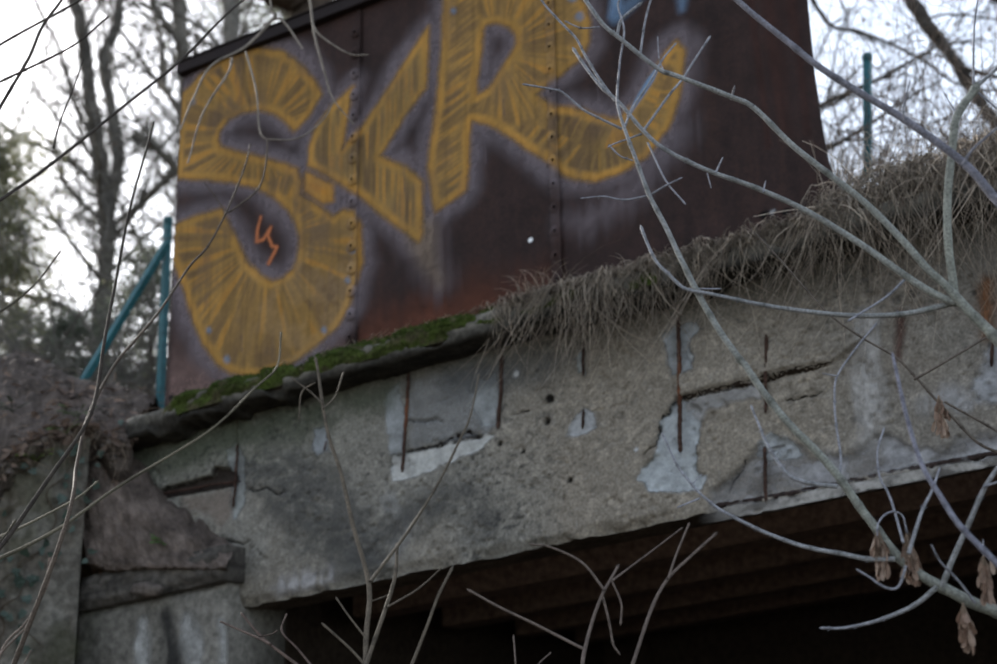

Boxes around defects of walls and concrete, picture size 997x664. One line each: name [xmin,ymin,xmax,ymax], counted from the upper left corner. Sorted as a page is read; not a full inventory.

rust [169,357,222,403]
spalling [386,355,504,481]
spalling [568,408,597,436]
spalling [637,309,761,492]
crack [682,334,832,413]
spalling [163,419,246,519]
crack [248,487,287,495]